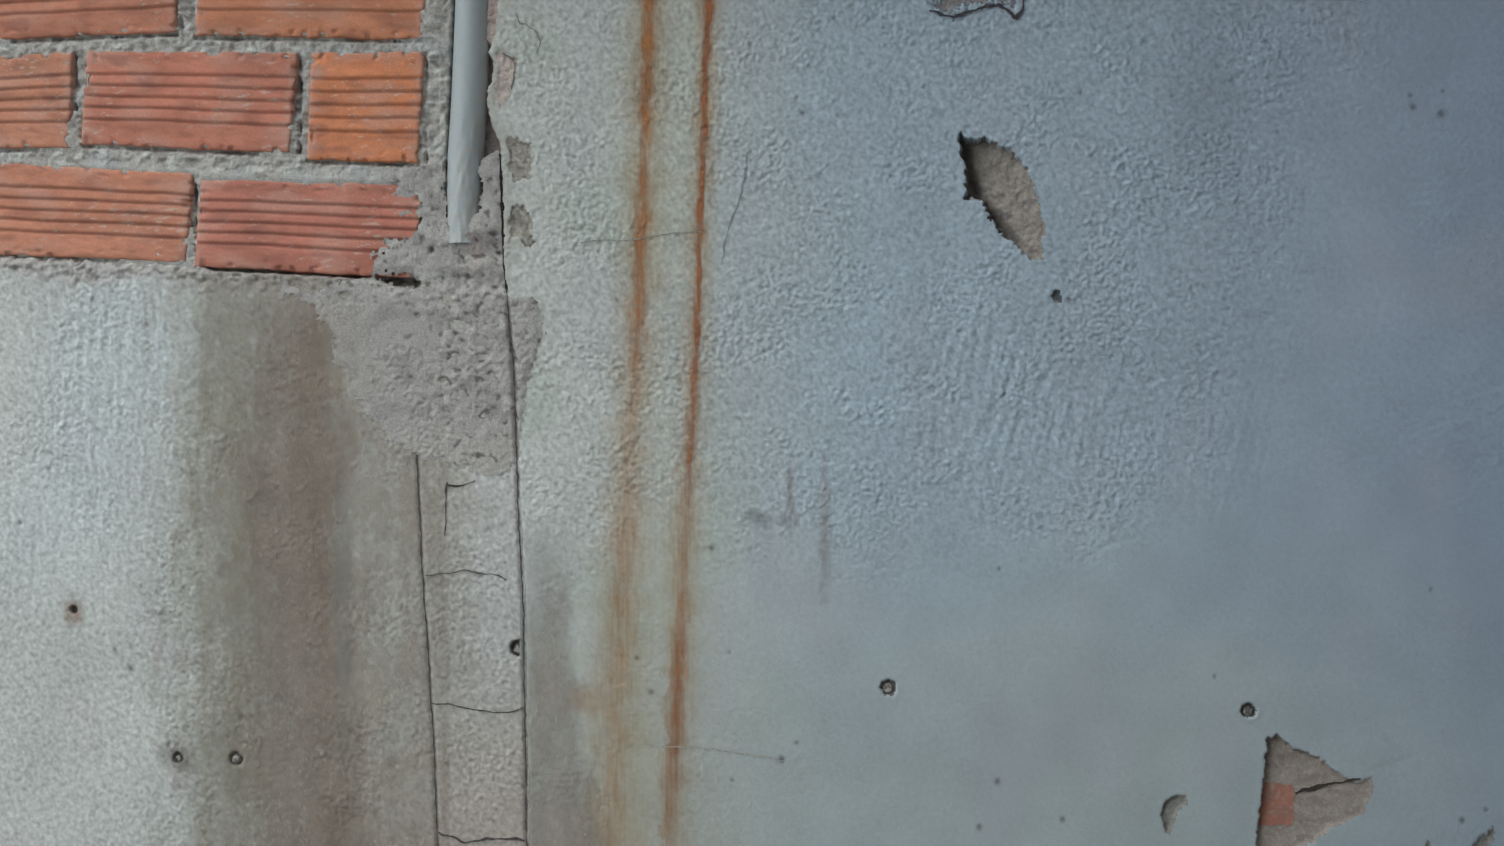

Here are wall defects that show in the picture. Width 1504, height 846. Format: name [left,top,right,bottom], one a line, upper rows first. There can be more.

rust [641,0,654,143]
peeling [505,136,532,183]
peeling [508,205,536,248]
rust [636,172,646,319]
rust [692,0,712,417]
flaking render [960,134,1046,261]
damp [206,294,440,846]
crack [416,154,528,846]
flaking render [1160,795,1188,835]
flaking render [1257,734,1374,846]